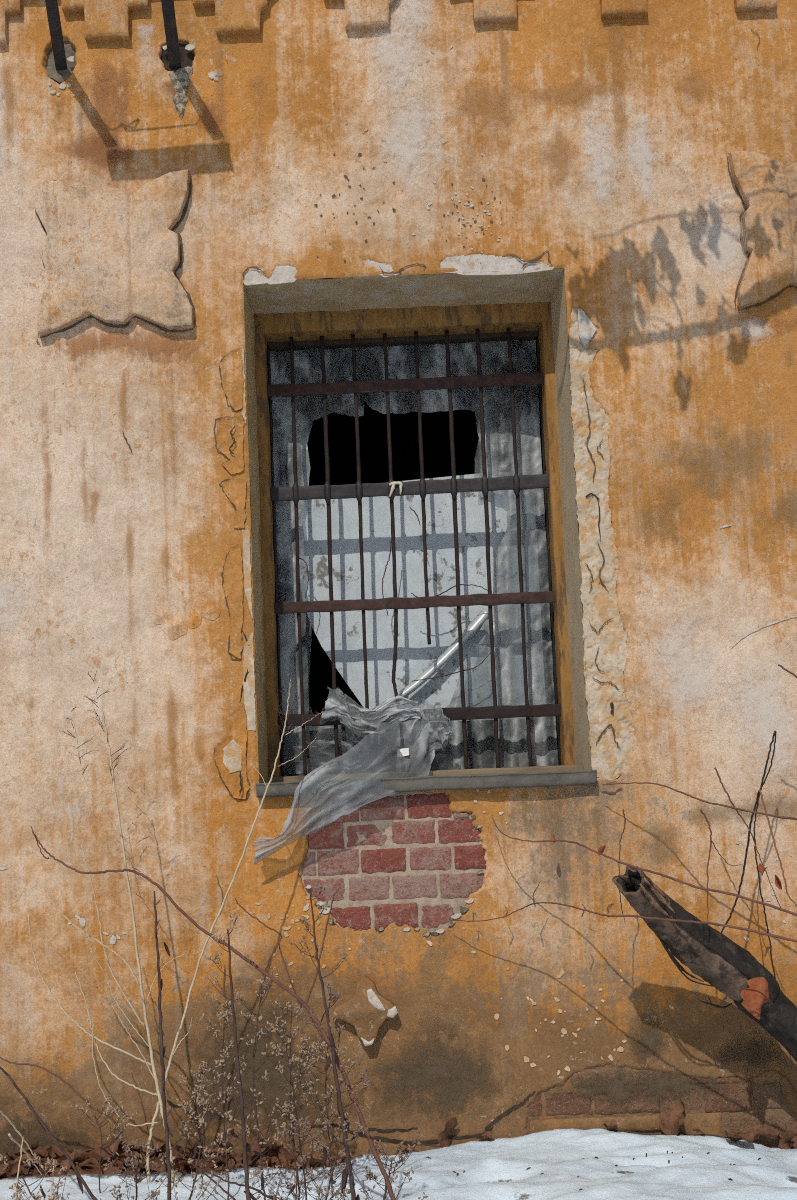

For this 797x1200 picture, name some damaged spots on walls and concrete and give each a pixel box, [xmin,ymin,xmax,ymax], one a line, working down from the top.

spalling [45,41,76,97]
spalling [161,43,195,119]
peeling [363,178,554,278]
peeling [242,266,297,286]
flaking render [213,347,256,802]
spalling [568,308,635,781]
spalling [253,788,507,988]
spalling [535,997,580,1038]
water stain [186,1005,322,1136]
water stain [373,1031,495,1110]
water stain [0,1116,86,1164]